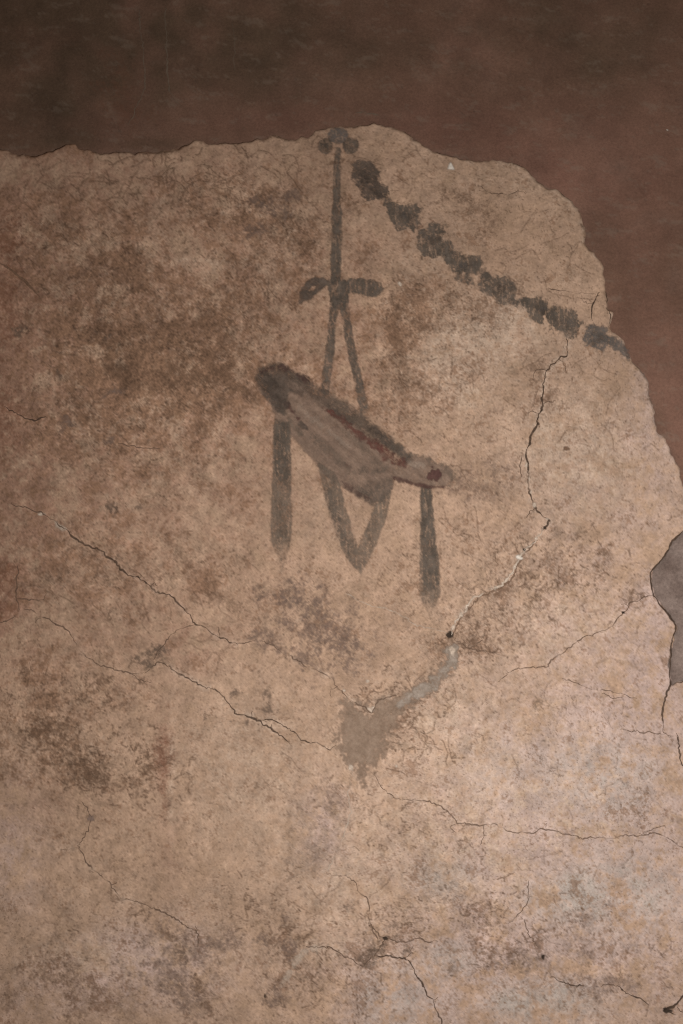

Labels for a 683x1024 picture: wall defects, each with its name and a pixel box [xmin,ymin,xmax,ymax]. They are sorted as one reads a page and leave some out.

crack [519,339,568,529]
crack [0,504,333,750]
crack [456,532,683,766]
crack [80,802,199,942]
crack [306,880,442,1024]
crack [377,779,593,842]